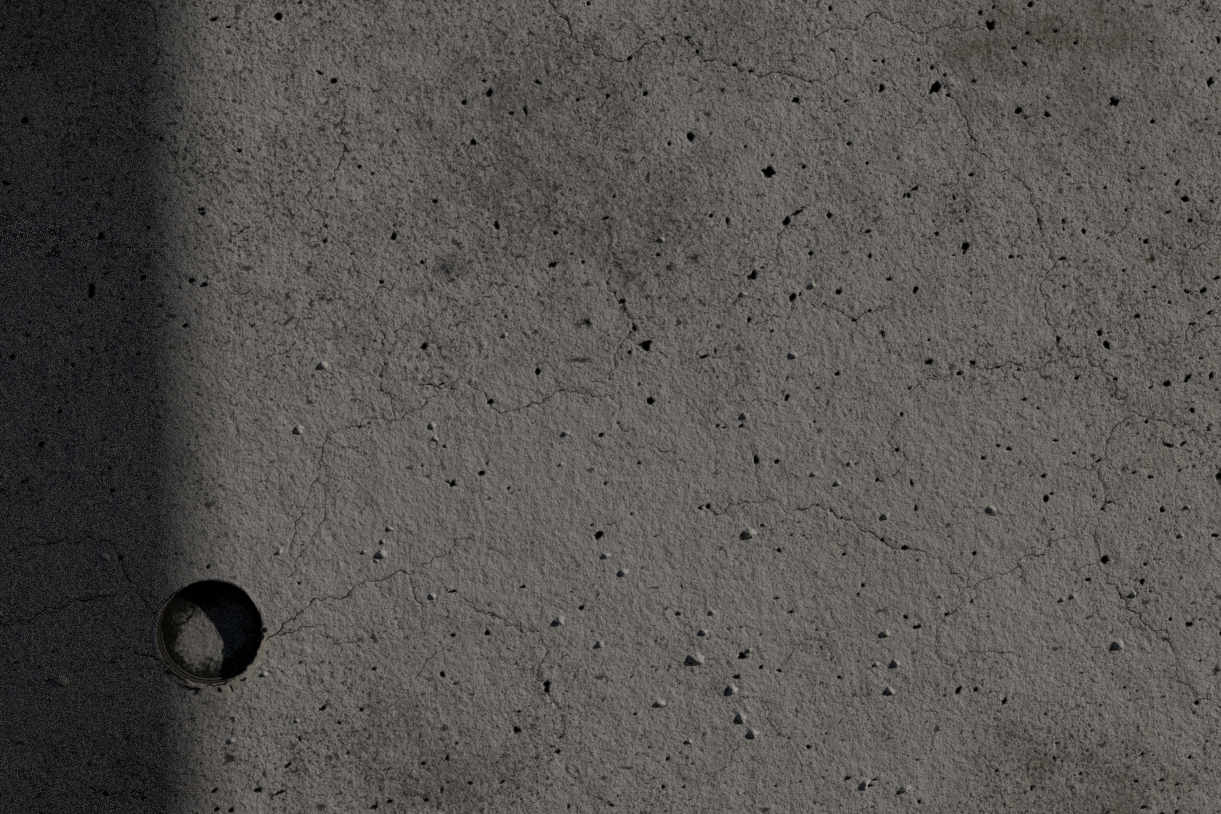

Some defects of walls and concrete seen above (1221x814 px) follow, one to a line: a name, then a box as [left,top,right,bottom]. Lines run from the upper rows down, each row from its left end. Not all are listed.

crack [53,0,220,187]
crack [549,0,976,83]
crack [265,109,689,679]
crack [700,83,1221,717]
crack [0,535,158,627]
crack [460,595,565,736]